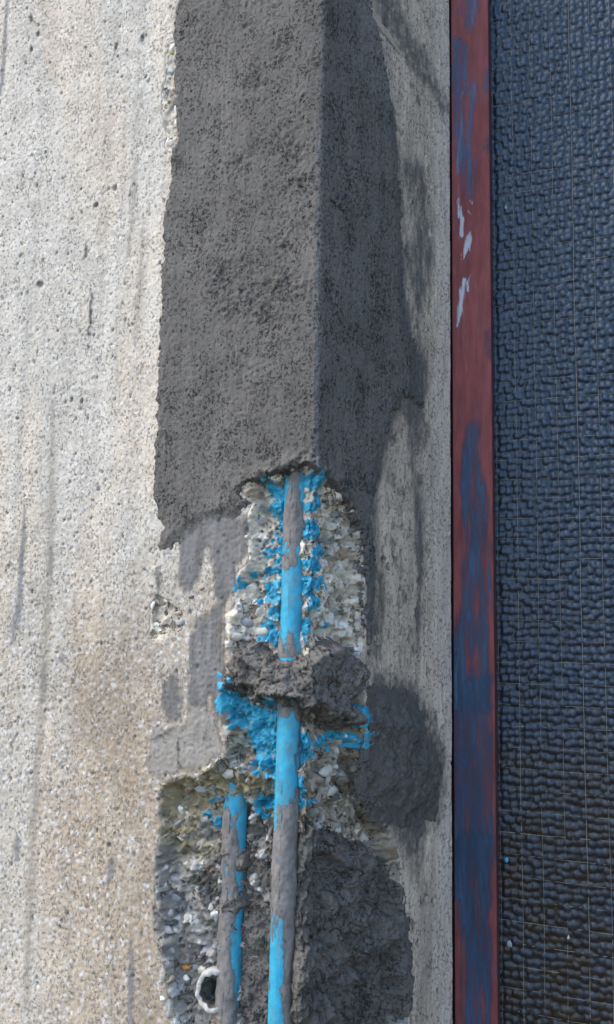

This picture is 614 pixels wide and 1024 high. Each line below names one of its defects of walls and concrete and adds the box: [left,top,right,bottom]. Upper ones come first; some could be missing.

spalling [148,595,185,642]
spalling [224,466,366,660]
spalling [153,671,282,1024]
spalling [297,690,400,883]
spalling [385,1015,408,1024]